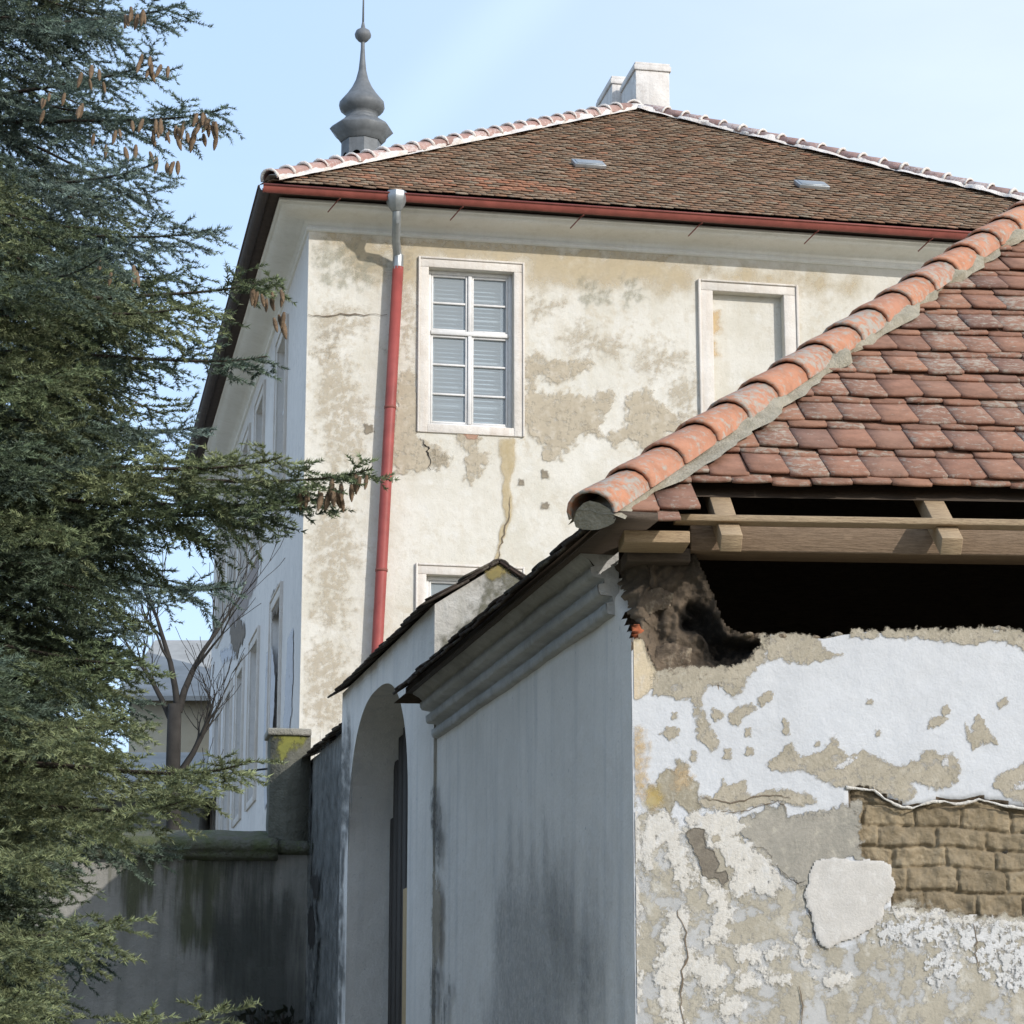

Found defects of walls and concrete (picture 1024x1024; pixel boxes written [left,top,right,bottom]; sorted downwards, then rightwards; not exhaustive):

crack [308,311,387,319]
peeling [525,330,694,479]
crack [498,499,510,559]
water stain [111,858,155,918]
water stain [201,718,352,1024]
water stain [430,787,450,1024]
crack [677,910,689,1024]
peeling [633,625,1024,1024]